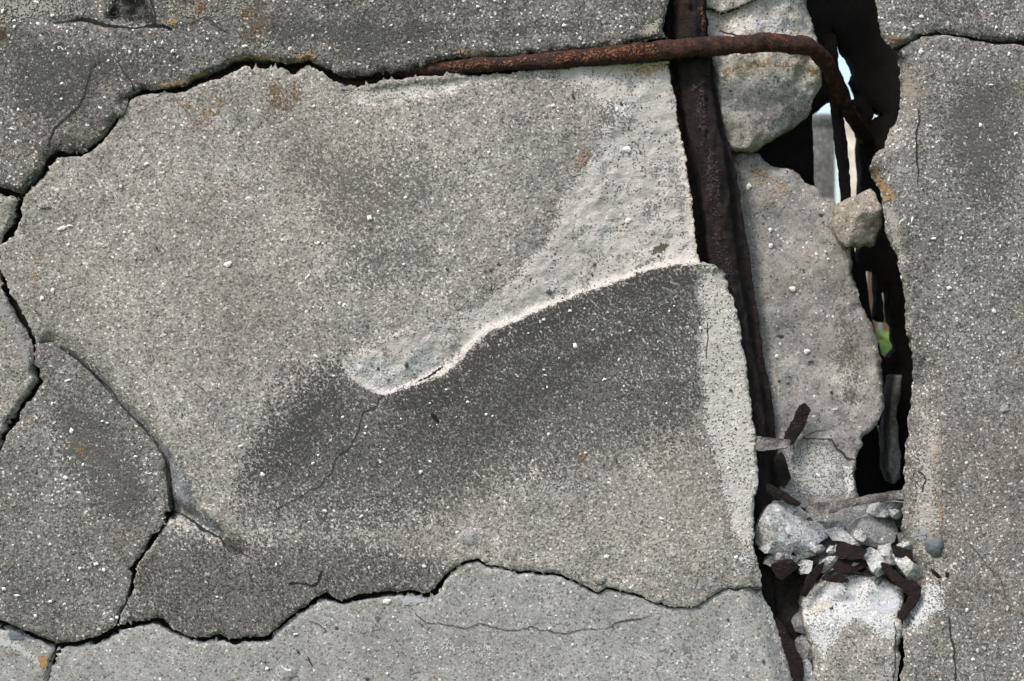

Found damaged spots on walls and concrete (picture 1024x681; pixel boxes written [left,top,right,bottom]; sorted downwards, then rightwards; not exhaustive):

crack [0,0,682,678]
water stain [121,264,722,638]
spalling [326,62,758,559]
spalling [709,595,786,681]
rust [754,403,811,507]
spalling [783,435,856,502]
spalling [802,382,947,668]
spalling [883,202,915,267]